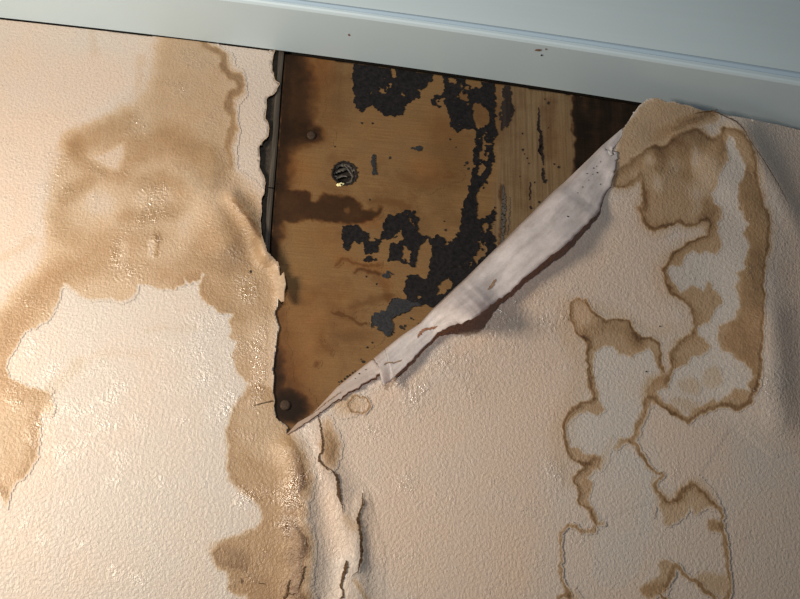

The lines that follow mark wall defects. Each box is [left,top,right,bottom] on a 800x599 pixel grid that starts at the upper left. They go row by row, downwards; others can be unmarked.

damp [0,36,372,599]
crack [318,416,365,599]
peeling [372,298,421,336]
damp [555,98,779,599]